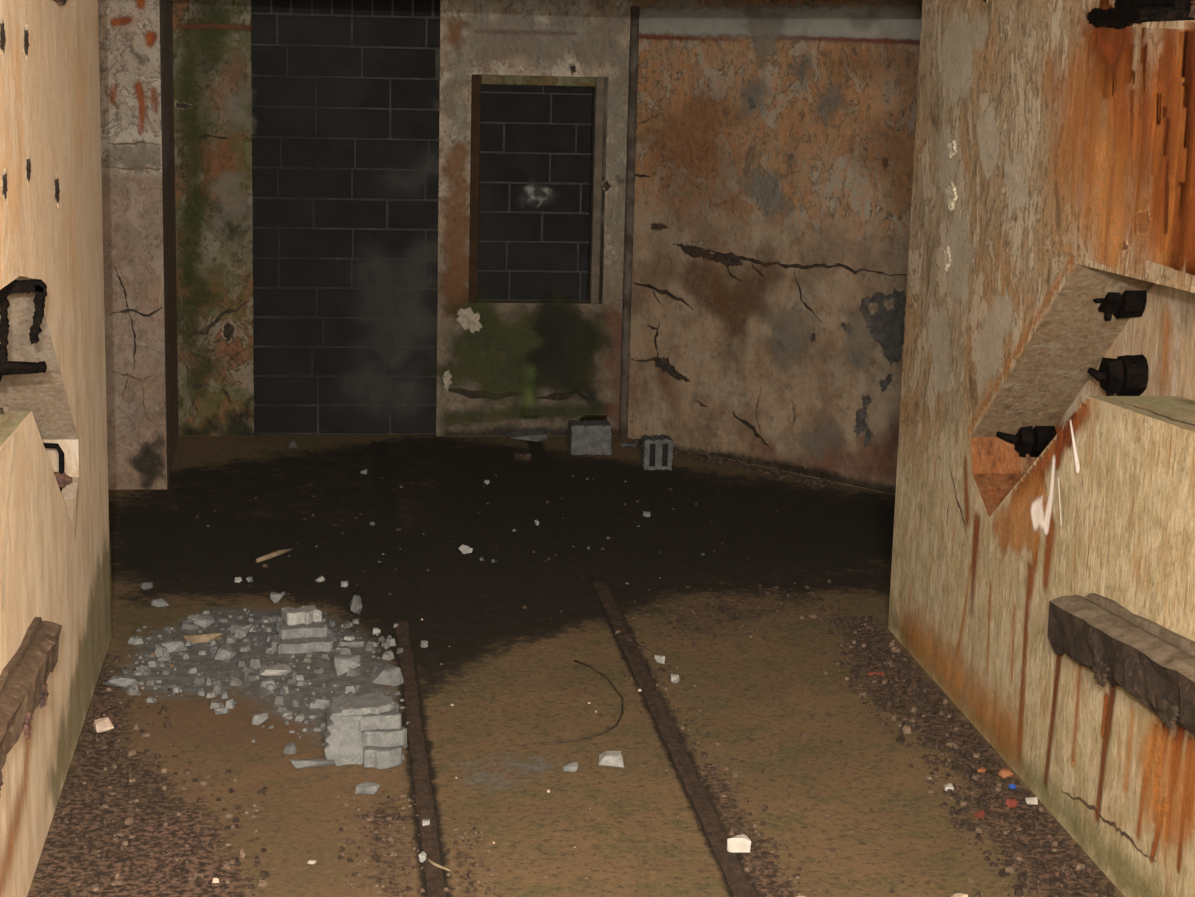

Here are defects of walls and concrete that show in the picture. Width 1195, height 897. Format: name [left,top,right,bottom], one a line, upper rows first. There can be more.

rust [111,0,145,25]
rust [135,82,157,129]
rust [146,32,156,46]
rust [1086,26,1195,266]
crack [672,244,907,322]
damp [526,301,597,403]
crack [631,282,769,446]
peeling [840,287,906,447]
rust [956,402,1088,762]
rust [1045,654,1061,785]
rust [1096,684,1116,820]
rust [1125,711,1195,873]